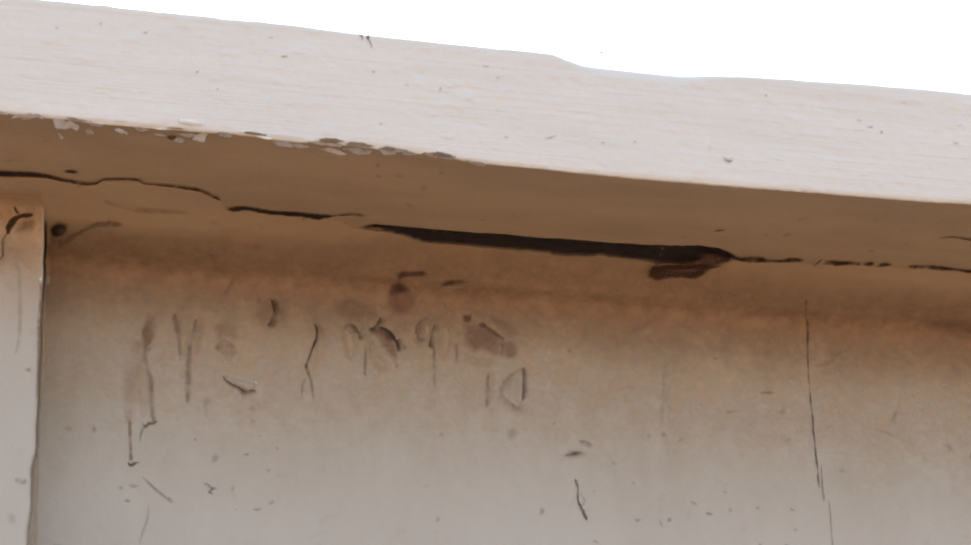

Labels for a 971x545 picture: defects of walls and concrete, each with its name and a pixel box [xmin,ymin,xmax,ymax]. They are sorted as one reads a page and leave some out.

peeling [0,111,100,140]
peeling [114,127,455,160]
crack [0,171,971,280]
water stain [0,194,971,492]
crack [806,301,823,483]